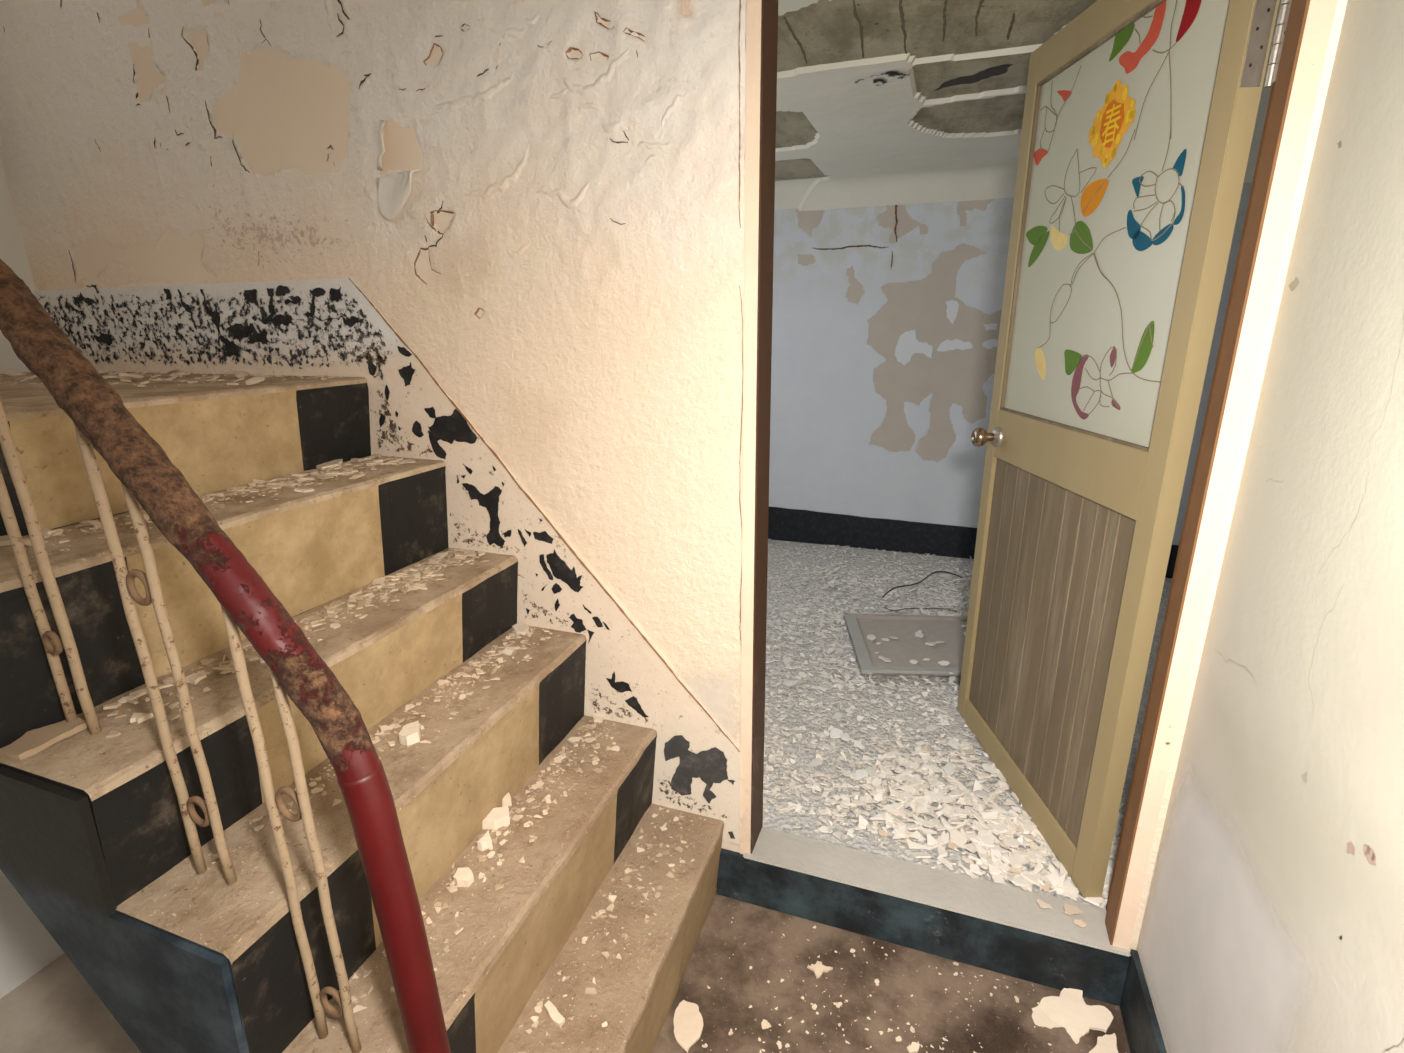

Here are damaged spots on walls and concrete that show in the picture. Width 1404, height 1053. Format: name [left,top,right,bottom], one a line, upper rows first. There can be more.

peeling [212,46,352,177]
peeling [375,119,423,221]
peeling [423,43,443,66]
crack [423,202,443,249]
spalling [777,0,1097,133]
peeling [39,284,477,459]
peeling [846,199,1002,462]
flaking render [316,459,343,470]
peeling [450,464,610,643]
crack [1308,313,1404,713]
flaking render [0,718,88,760]
peeling [591,671,735,839]